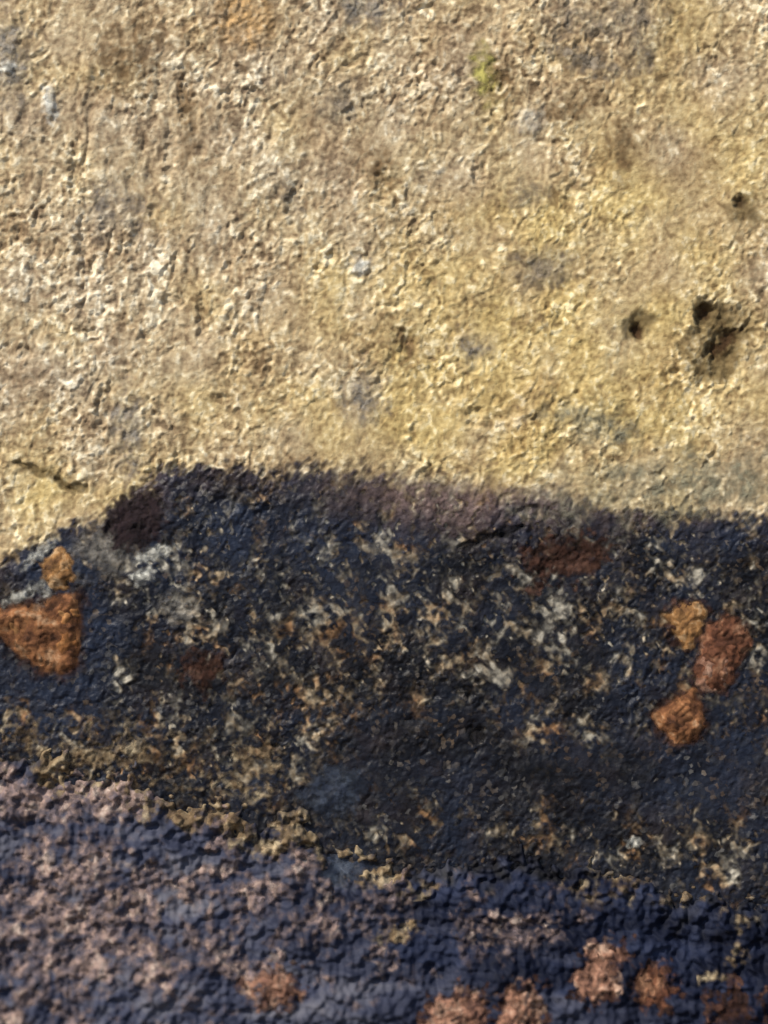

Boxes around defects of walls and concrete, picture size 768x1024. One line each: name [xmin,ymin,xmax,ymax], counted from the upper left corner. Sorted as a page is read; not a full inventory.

damp [102,486,178,579]
damp [644,454,757,505]
corrosion [0,546,84,676]
corrosion [651,599,752,746]
damp [0,764,330,1024]
damp [293,870,405,938]